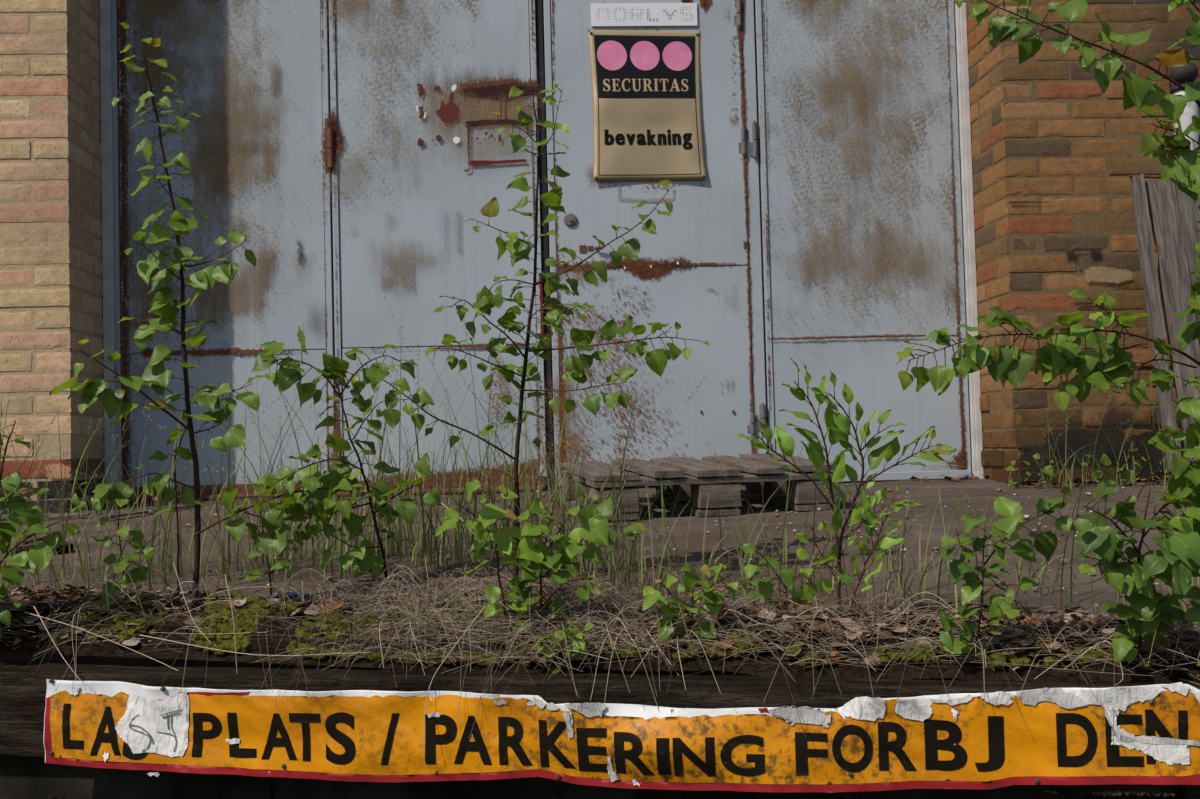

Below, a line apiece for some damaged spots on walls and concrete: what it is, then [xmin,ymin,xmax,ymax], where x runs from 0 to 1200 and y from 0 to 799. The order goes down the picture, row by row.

corrosion [116,0,302,485]
corrosion [326,379,341,471]
corrosion [306,0,556,213]
corrosion [370,0,968,487]